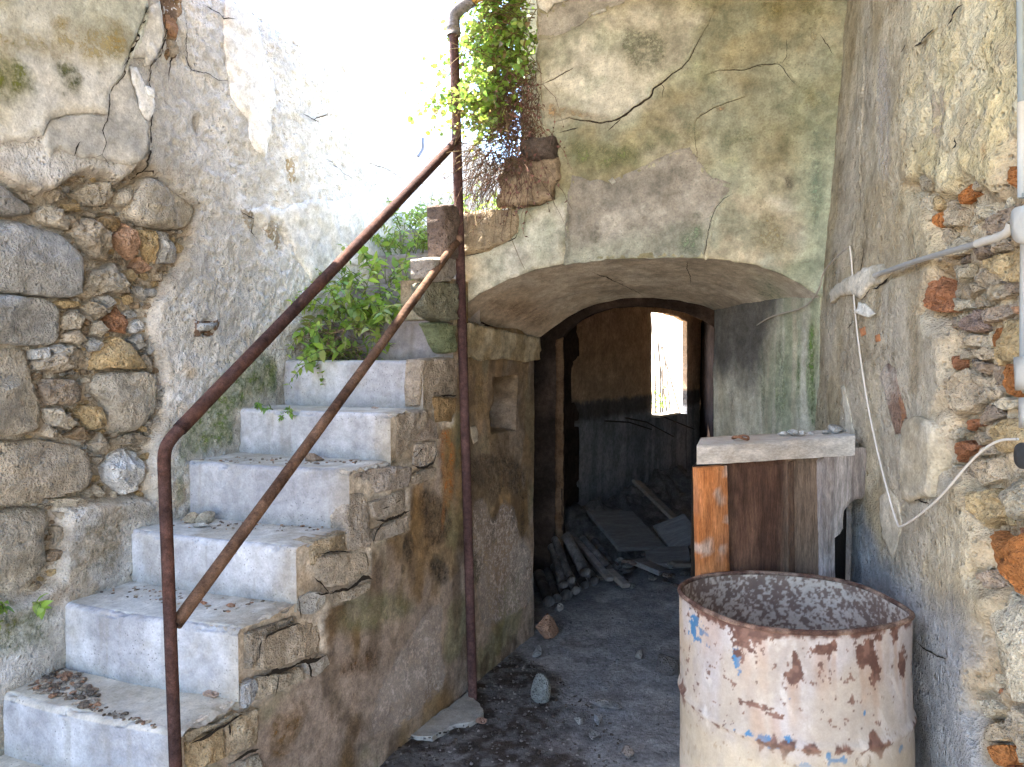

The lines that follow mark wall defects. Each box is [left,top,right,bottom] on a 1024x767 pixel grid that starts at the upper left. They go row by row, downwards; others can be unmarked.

crack [74,3,234,183]
crack [542,66,573,84]
crack [547,10,799,158]
flaking render [564,147,730,265]
crack [686,192,736,281]
spalling [0,169,193,591]
spalling [917,166,1024,767]